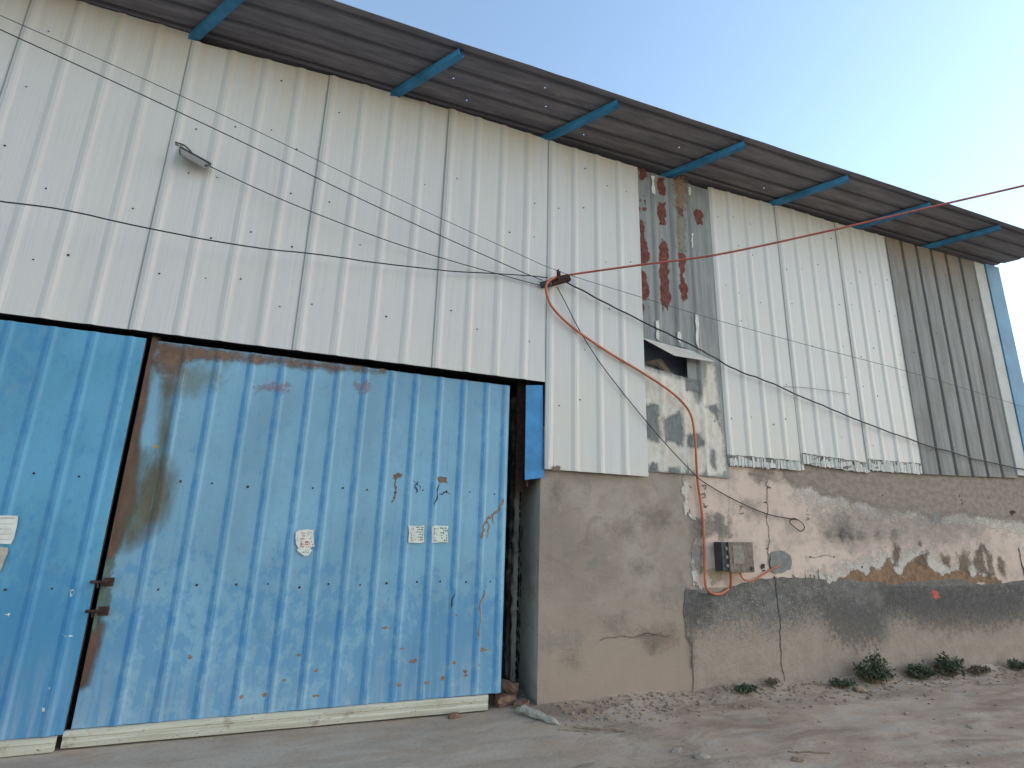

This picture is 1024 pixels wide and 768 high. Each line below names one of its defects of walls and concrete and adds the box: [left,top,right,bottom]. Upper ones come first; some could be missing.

rust [638,169,704,311]
rust [80,337,365,688]
rust [452,590,487,677]
rust [481,499,504,539]
crack [601,633,671,641]
crack [763,482,826,681]
peeling [645,363,1024,590]